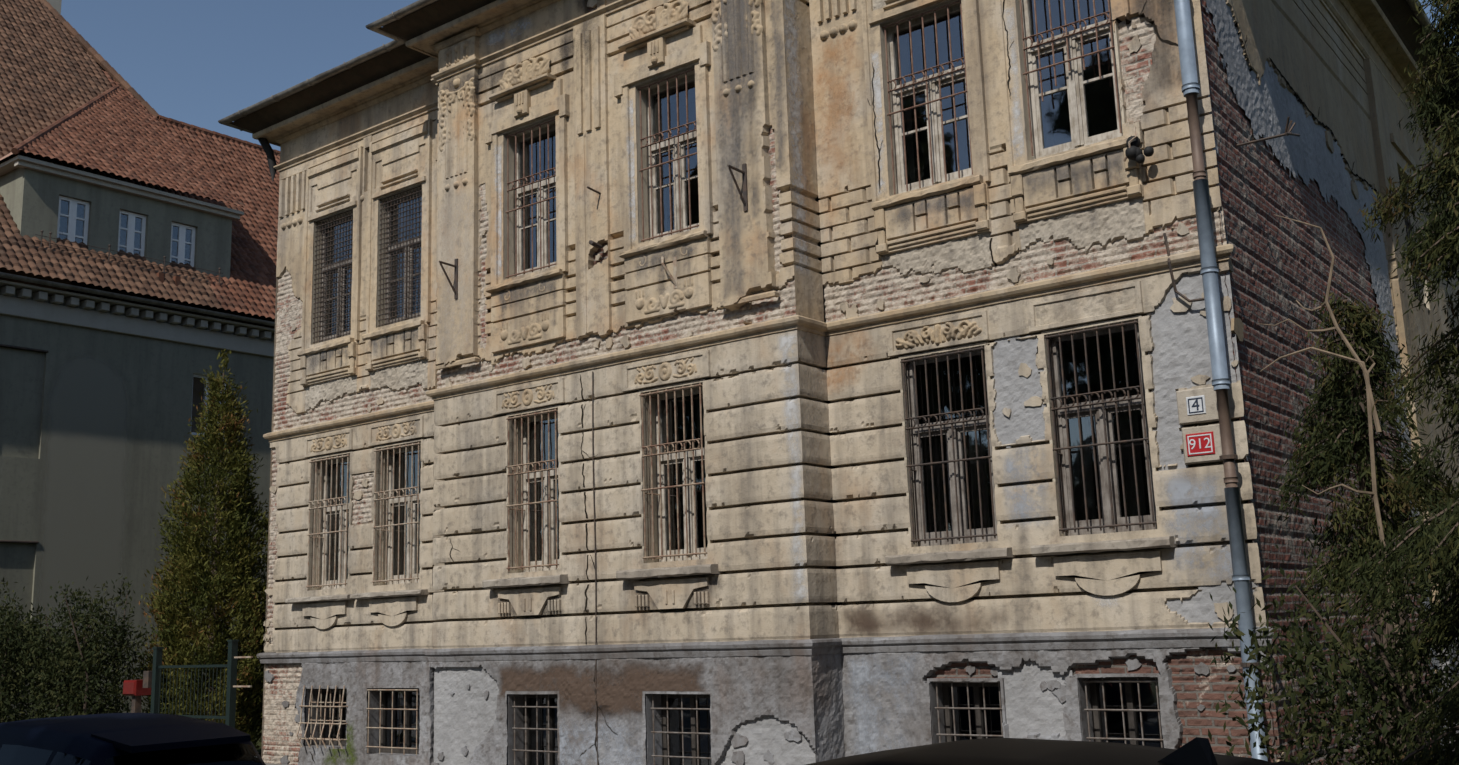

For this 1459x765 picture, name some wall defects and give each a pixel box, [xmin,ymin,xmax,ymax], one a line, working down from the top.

flaking render [263,127,796,644]
peeling [780,336,804,597]
flaking render [824,0,1412,765]
flaking render [262,663,304,765]
flaking render [431,667,499,765]
flaking render [718,716,816,765]
flaking render [1387,496,1446,757]